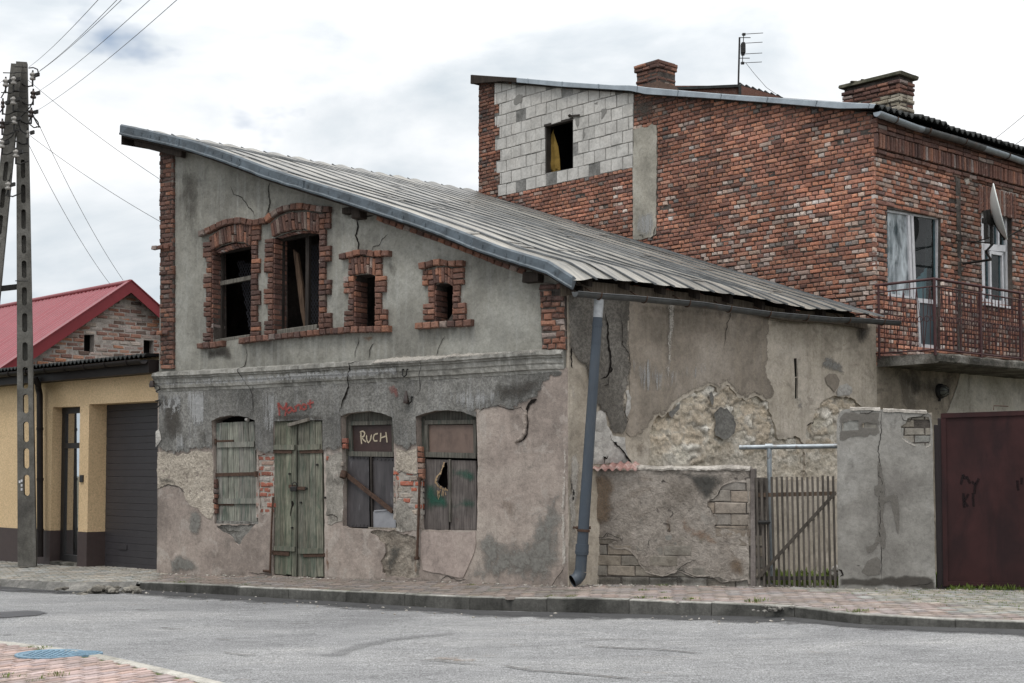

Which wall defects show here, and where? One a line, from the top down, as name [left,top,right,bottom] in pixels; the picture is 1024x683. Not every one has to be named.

flaking render [156,429,276,544]
crack [339,339,373,411]
flaking render [368,446,426,578]
crack [602,313,632,463]
flaking render [647,374,861,530]
crack [838,409,937,579]